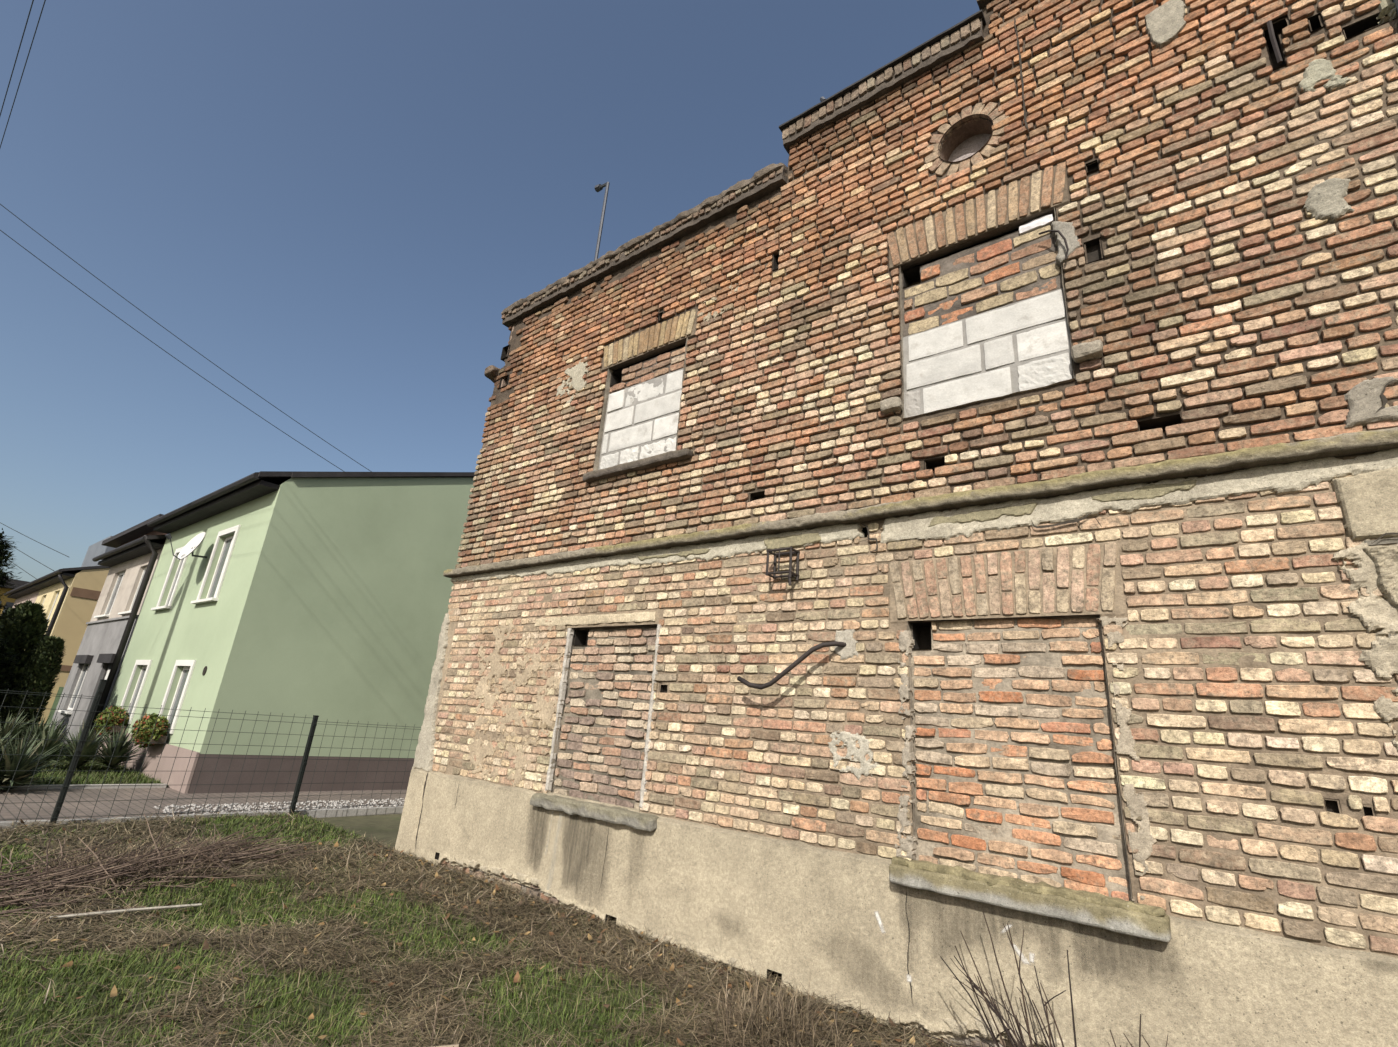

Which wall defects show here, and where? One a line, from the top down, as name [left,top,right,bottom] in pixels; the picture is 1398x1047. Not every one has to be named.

flaking render [450,448,1398,583]
leakage [532,808,588,883]